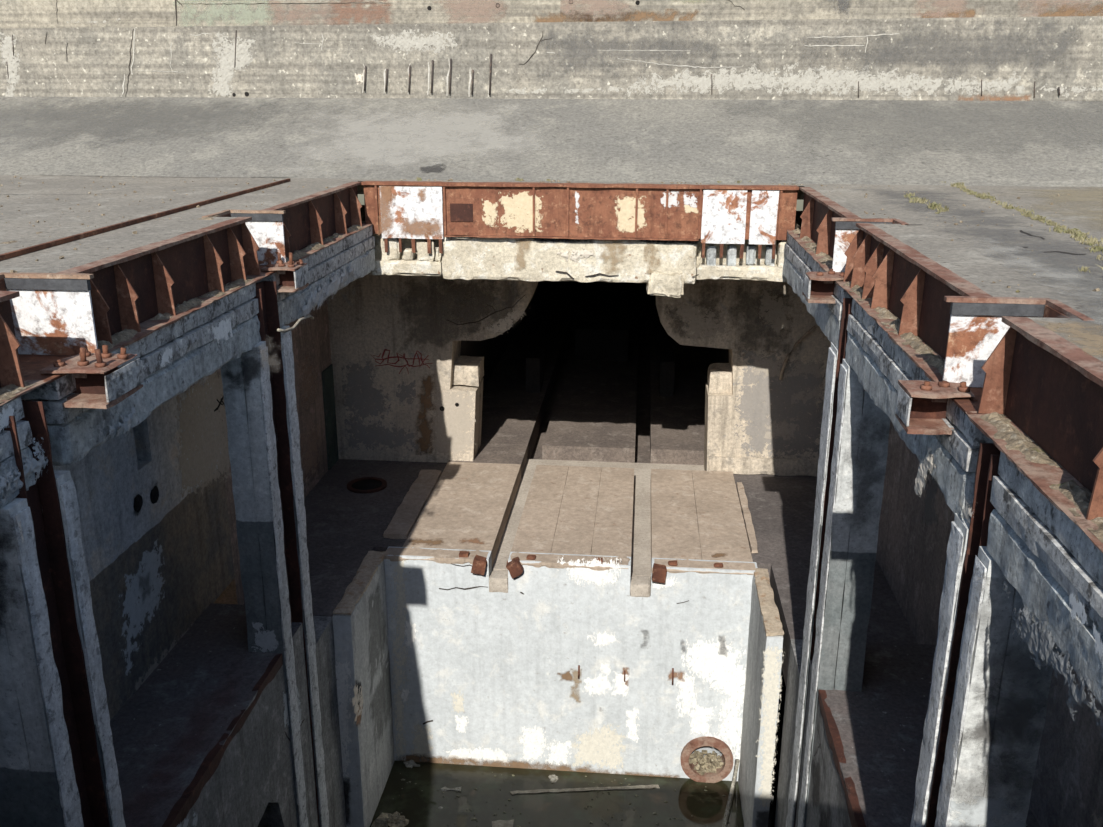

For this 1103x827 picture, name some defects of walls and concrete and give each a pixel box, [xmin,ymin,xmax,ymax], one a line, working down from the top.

rust [377,185,441,238]
spalling [0,191,1103,827]
rust [558,665,581,702]
rust [668,668,685,685]